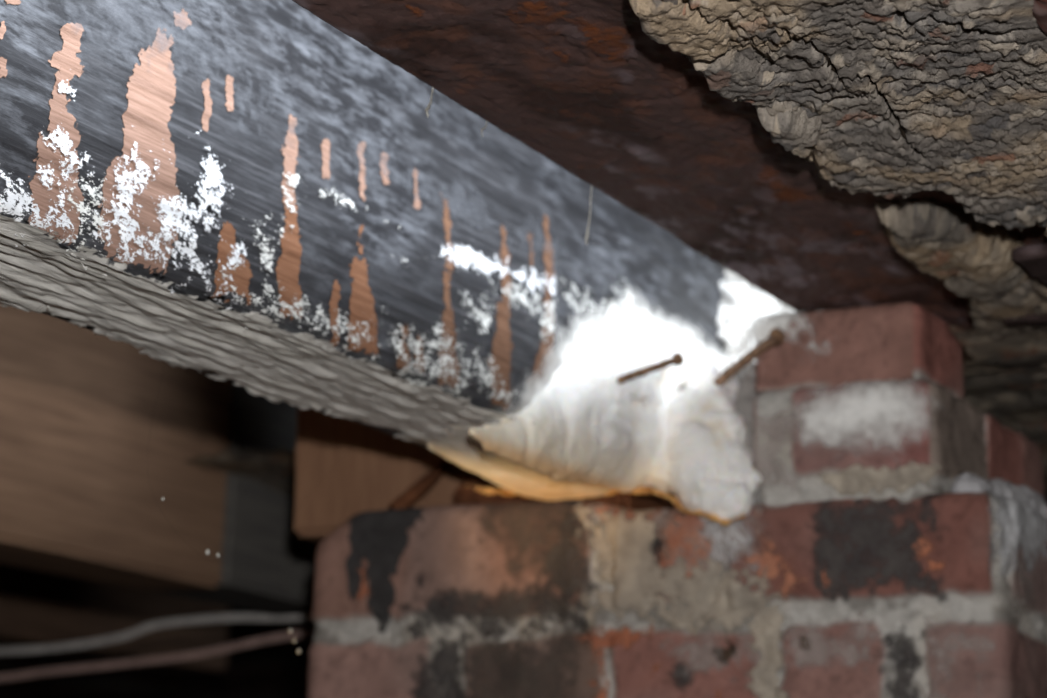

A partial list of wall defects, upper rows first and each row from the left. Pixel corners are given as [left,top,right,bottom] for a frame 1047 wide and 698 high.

damp [58,69,76,101]
damp [0,123,654,445]
damp [345,528,409,633]